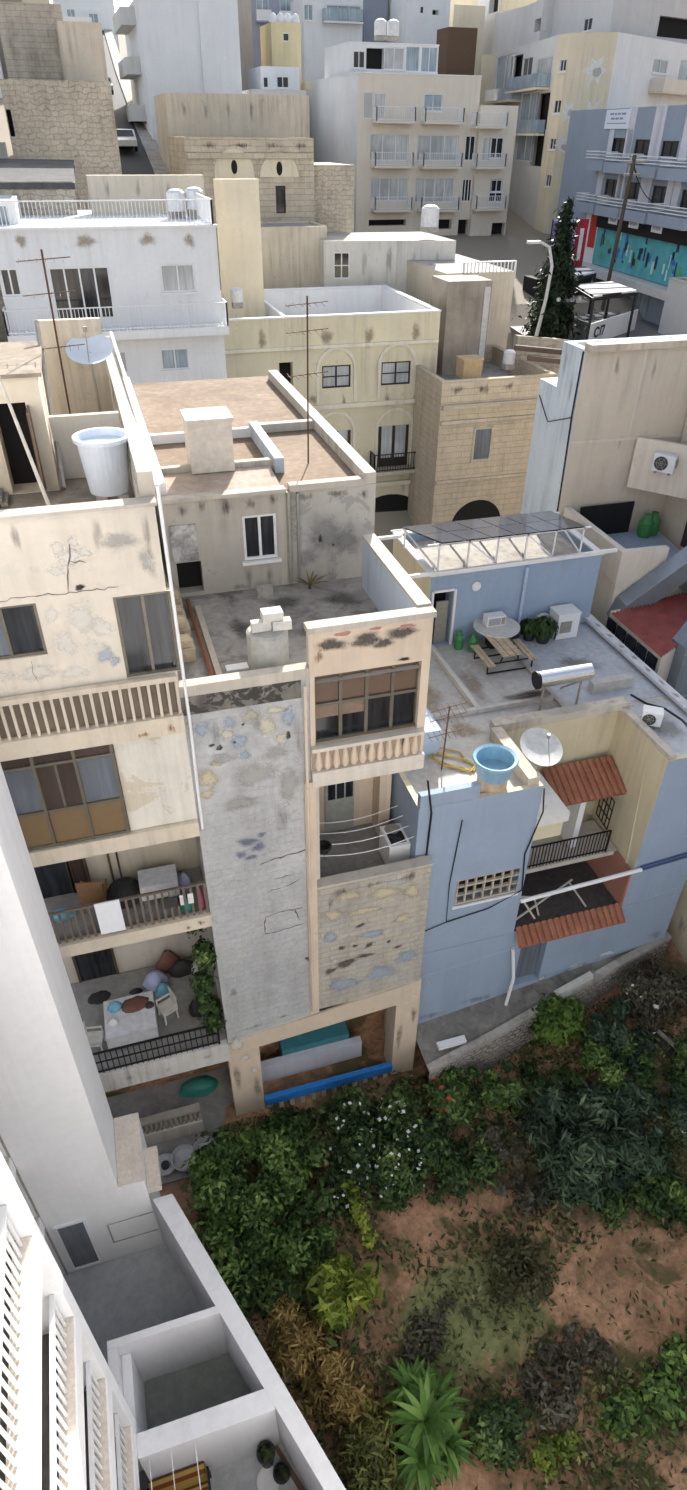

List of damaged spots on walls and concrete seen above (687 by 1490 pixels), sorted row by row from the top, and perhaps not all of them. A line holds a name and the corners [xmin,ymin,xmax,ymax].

crack [0,544,115,602]
peeling [99,647,119,666]
peeling [195,705,297,809]
peeling [237,833,264,859]
peeling [324,885,418,989]